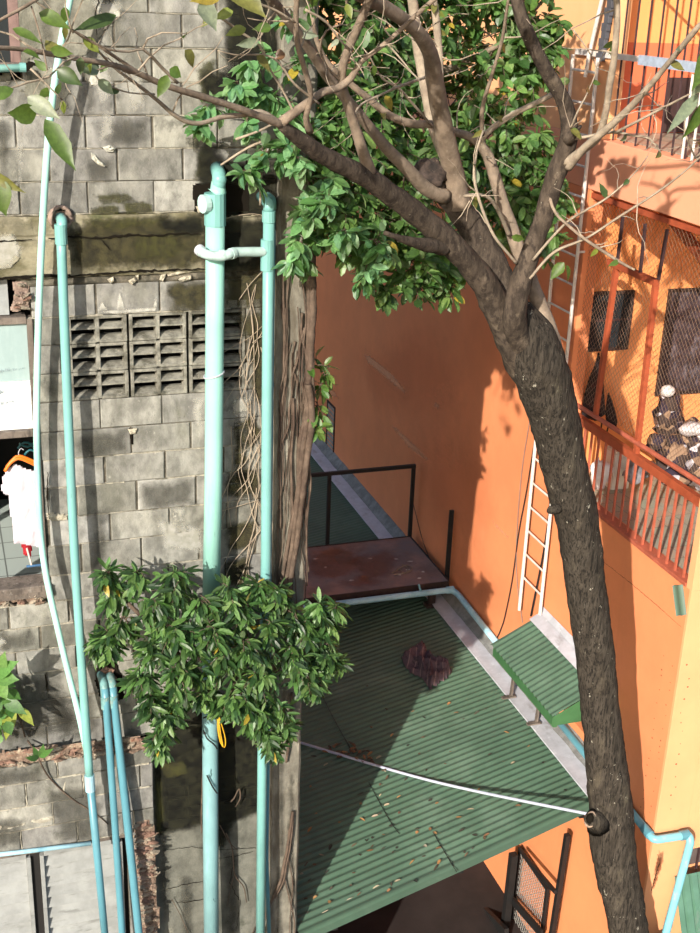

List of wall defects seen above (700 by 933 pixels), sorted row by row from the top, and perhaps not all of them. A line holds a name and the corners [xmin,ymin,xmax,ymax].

peeling [0,233,21,269]